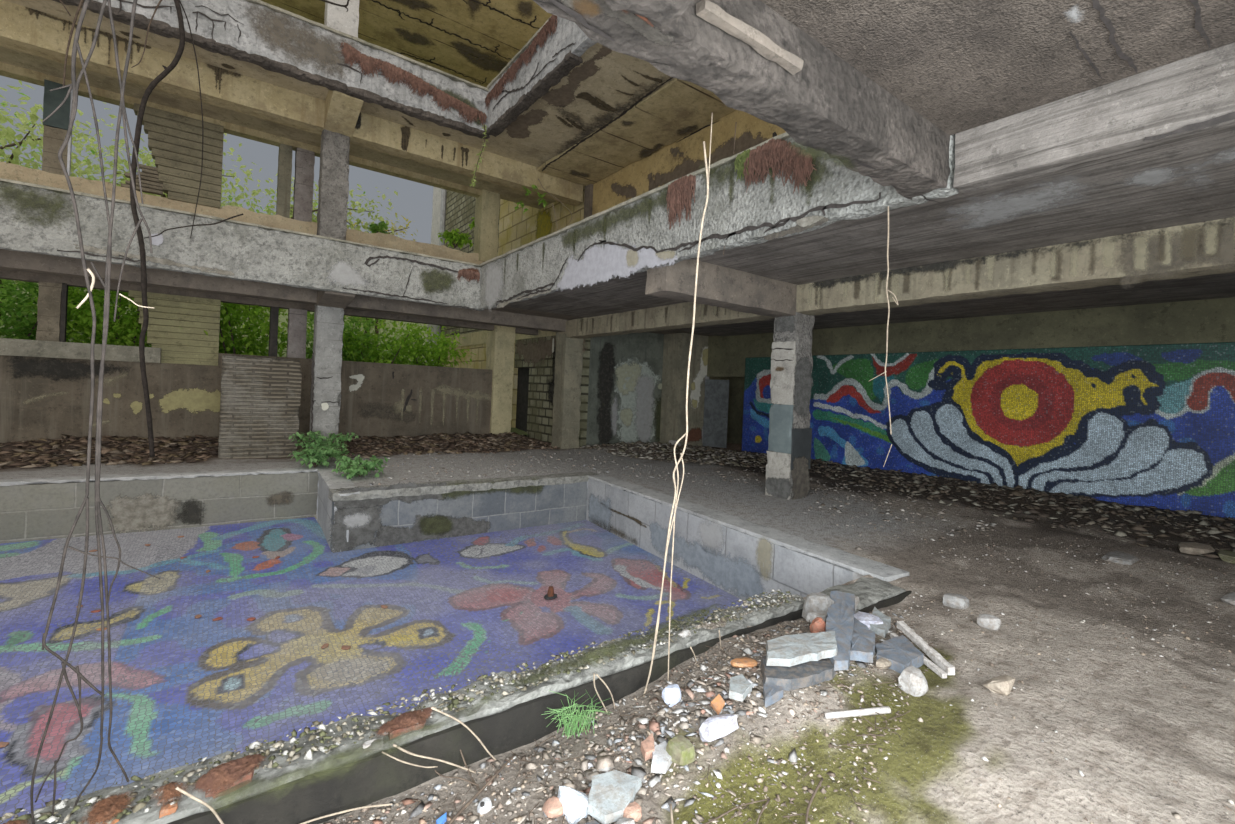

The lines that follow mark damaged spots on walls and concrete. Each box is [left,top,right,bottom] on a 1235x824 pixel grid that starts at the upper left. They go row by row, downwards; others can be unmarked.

damp [26,7,151,64]
damp [556,79,662,153]
damp [639,144,664,158]
crack [1144,112,1235,140]
crack [342,162,885,311]
damp [562,188,669,250]
peeling [497,241,678,308]
peeling [614,358,662,443]